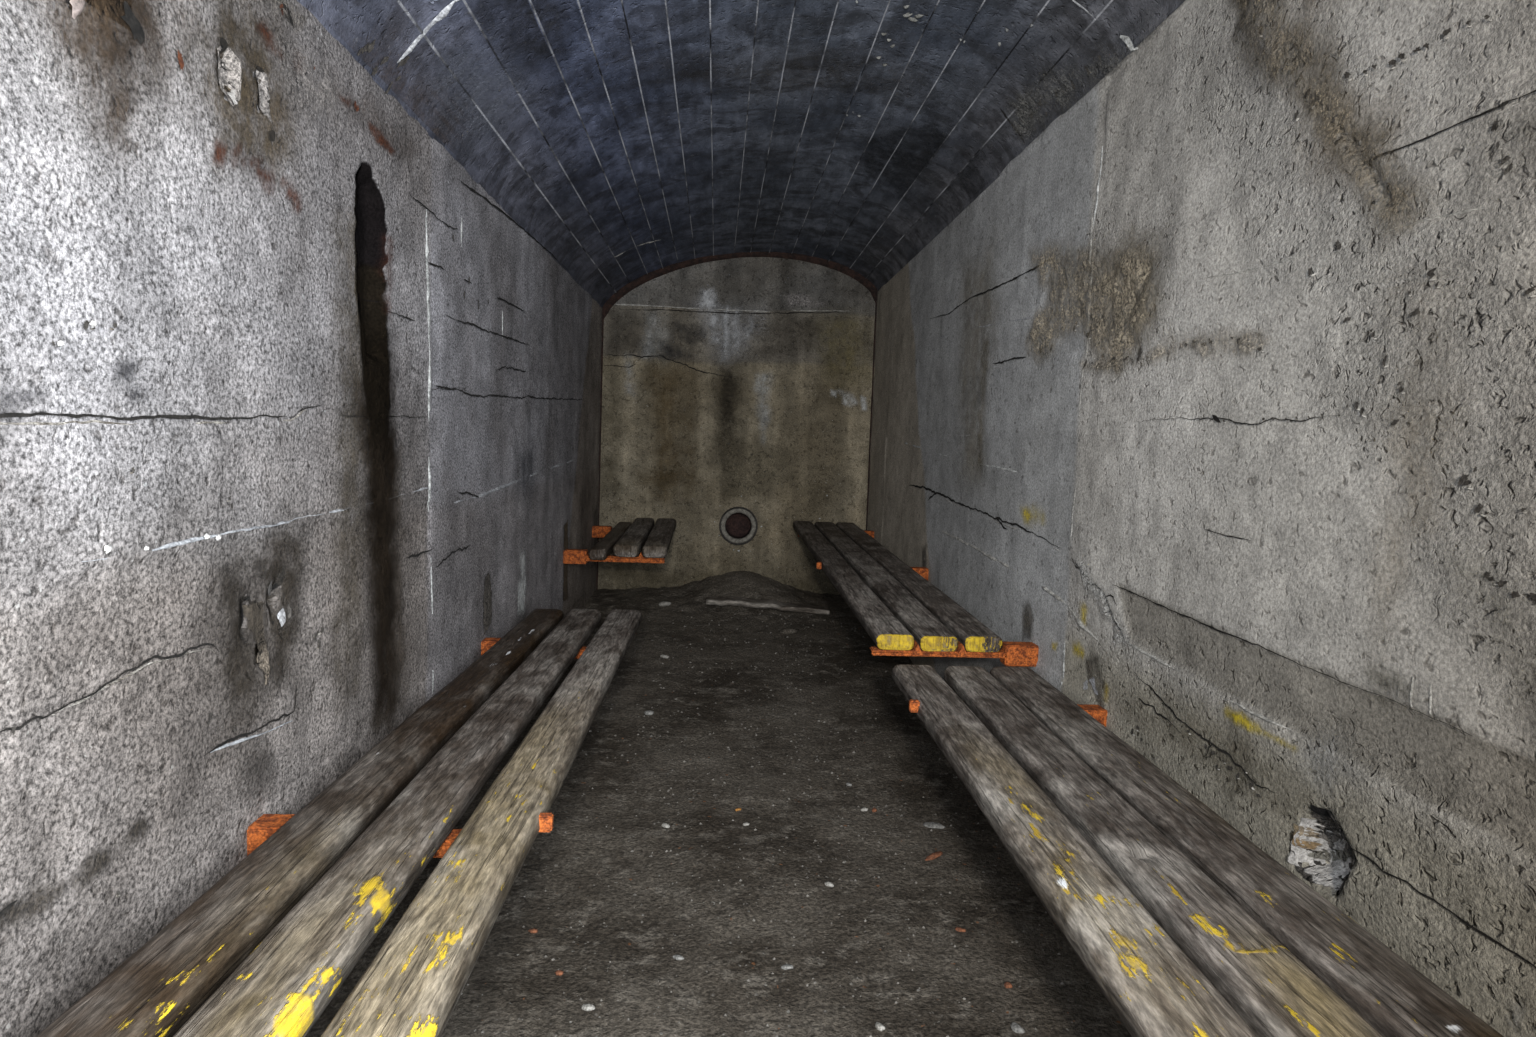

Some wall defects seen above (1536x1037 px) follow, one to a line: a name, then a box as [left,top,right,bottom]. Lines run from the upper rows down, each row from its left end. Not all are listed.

crack [1369,90,1536,163]
crack [410,195,458,229]
crack [458,179,568,270]
crack [0,262,582,425]
crack [930,253,1060,319]
spalling [1029,252,1264,371]
leakage [344,162,403,729]
crack [1137,415,1338,425]
crack [407,545,470,568]
crack [910,485,1472,793]
spalling [1288,804,1357,895]
crack [1349,847,1536,968]